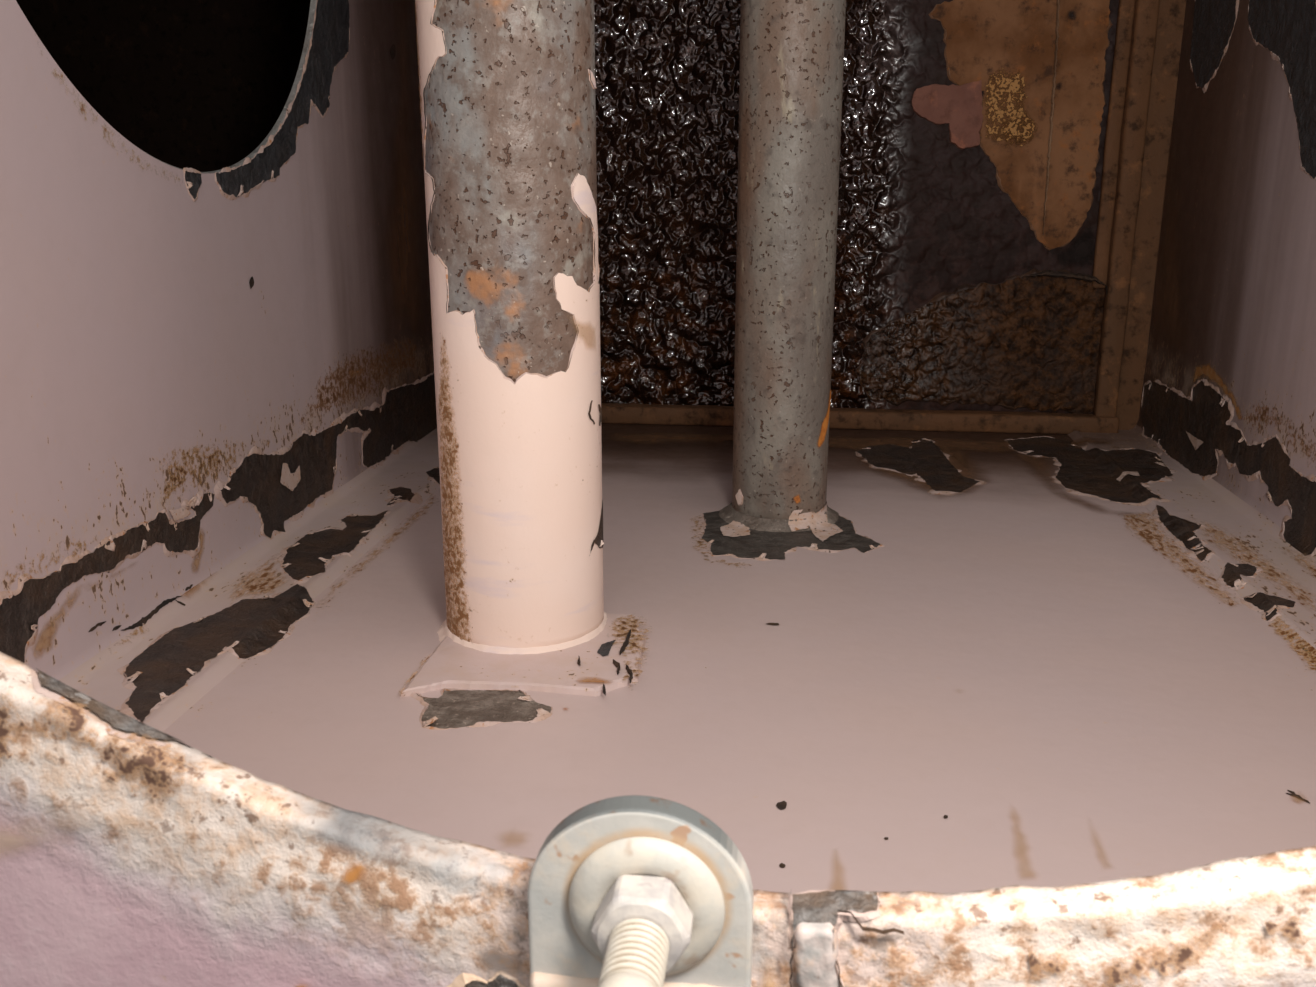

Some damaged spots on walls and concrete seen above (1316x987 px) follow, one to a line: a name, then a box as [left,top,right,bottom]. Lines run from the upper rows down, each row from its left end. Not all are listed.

peeling [183,0,350,202]
corrosion [985,68,1037,146]
peeling [0,372,440,758]
corrosion [326,339,473,642]
peeling [700,501,884,561]
peeling [1004,378,1316,622]
corrosion [0,701,197,798]
peeling [410,688,553,730]
crack [787,896,795,987]
crack [833,910,904,987]
corrosion [1102,924,1220,987]
corrosion [1264,915,1308,946]